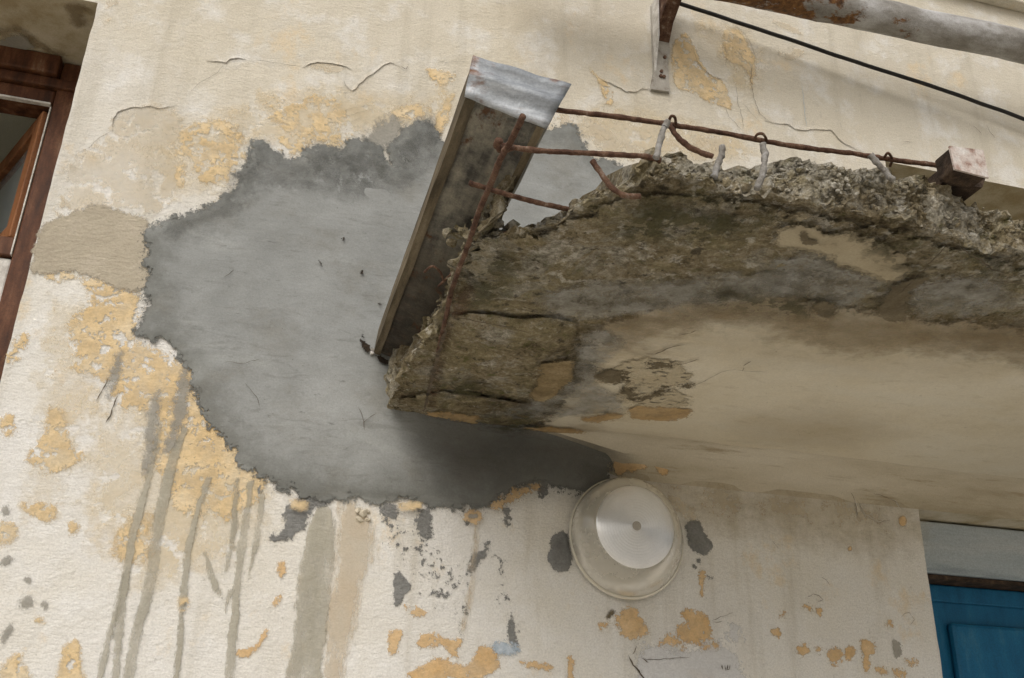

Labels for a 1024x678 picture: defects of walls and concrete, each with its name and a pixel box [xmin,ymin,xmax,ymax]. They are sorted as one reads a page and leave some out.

crack [195,56,408,91]
spalling [556,70,936,168]
spalling [396,113,1024,434]
damp [105,350,123,398]
flaking render [20,203,269,523]
damp [451,415,603,476]
damp [97,369,192,678]
damp [173,477,265,678]
damp [285,501,373,678]
peeling [404,565,501,678]
peeling [598,606,719,678]
peeling [796,620,919,678]